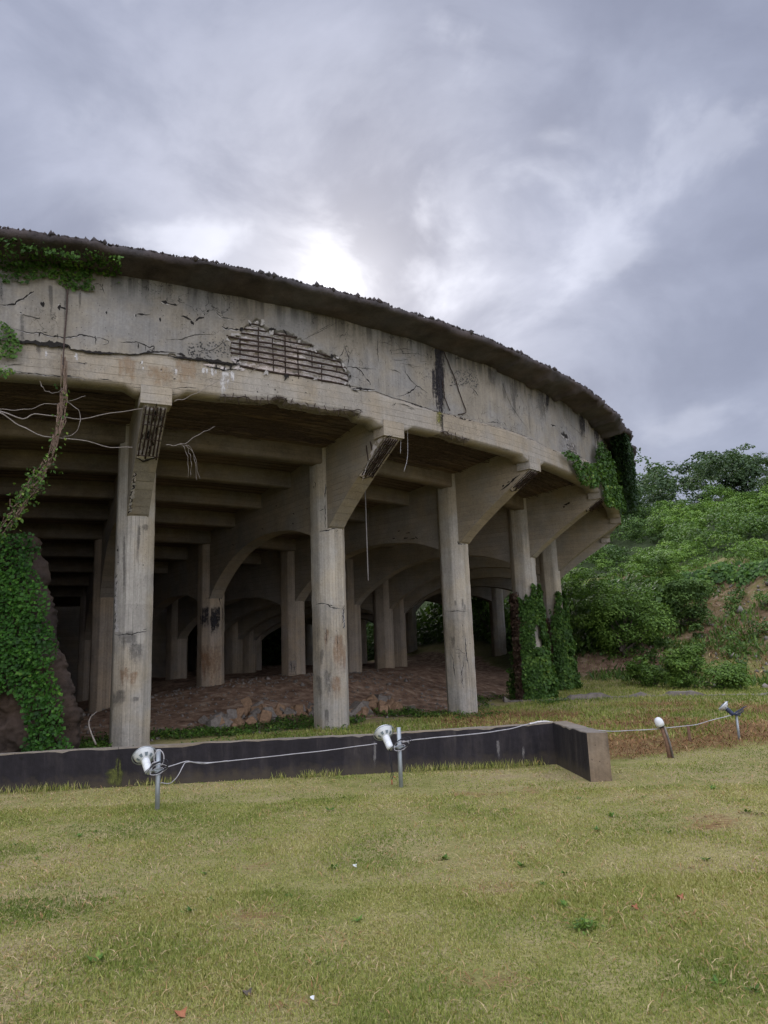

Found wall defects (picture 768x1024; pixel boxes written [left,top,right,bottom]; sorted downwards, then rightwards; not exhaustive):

crack [1,291,240,381]
spalling [188,319,363,418]
crack [303,325,432,410]
leakage [432,349,444,430]
spalling [128,403,166,513]
spalling [359,435,398,480]
leakage [200,607,223,632]